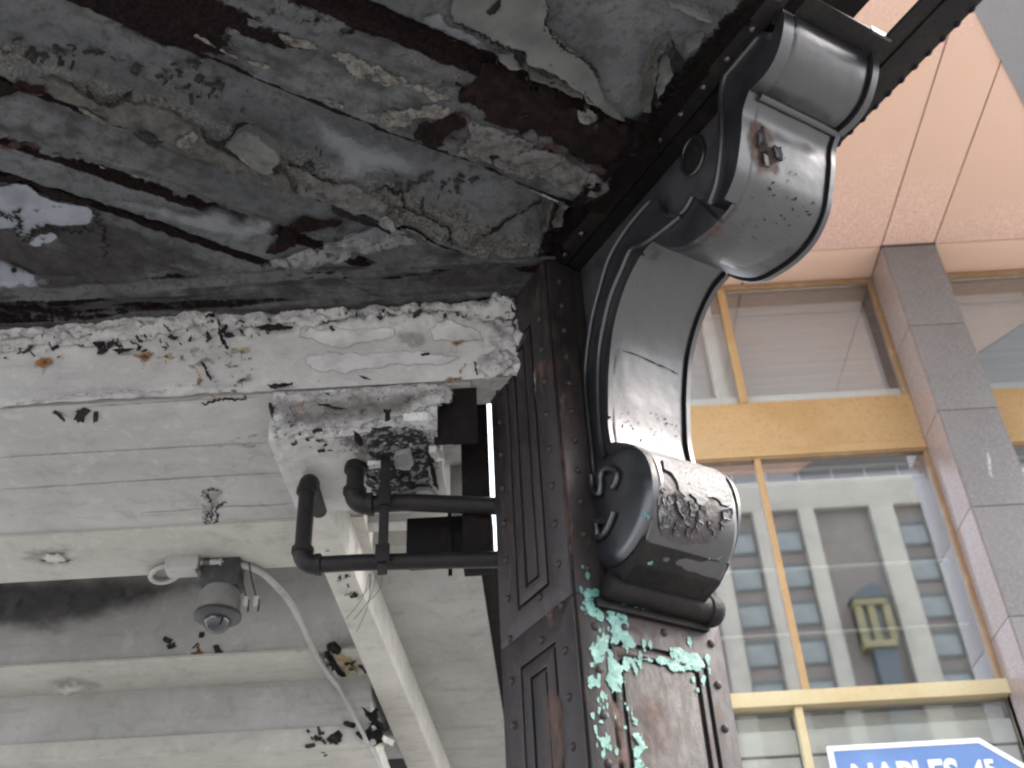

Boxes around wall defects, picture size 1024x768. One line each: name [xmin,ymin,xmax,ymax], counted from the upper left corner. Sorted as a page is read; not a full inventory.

peeling [79,6,168,51]
peeling [424,0,625,121]
peeling [0,183,94,247]
spalling [0,37,403,235]
peeling [384,169,481,200]
crack [374,184,542,249]
spalling [457,120,609,232]
corrosion [749,121,783,173]
peeling [0,261,38,289]
spalling [0,296,523,495]
peeling [621,412,733,546]
peeling [580,588,705,768]